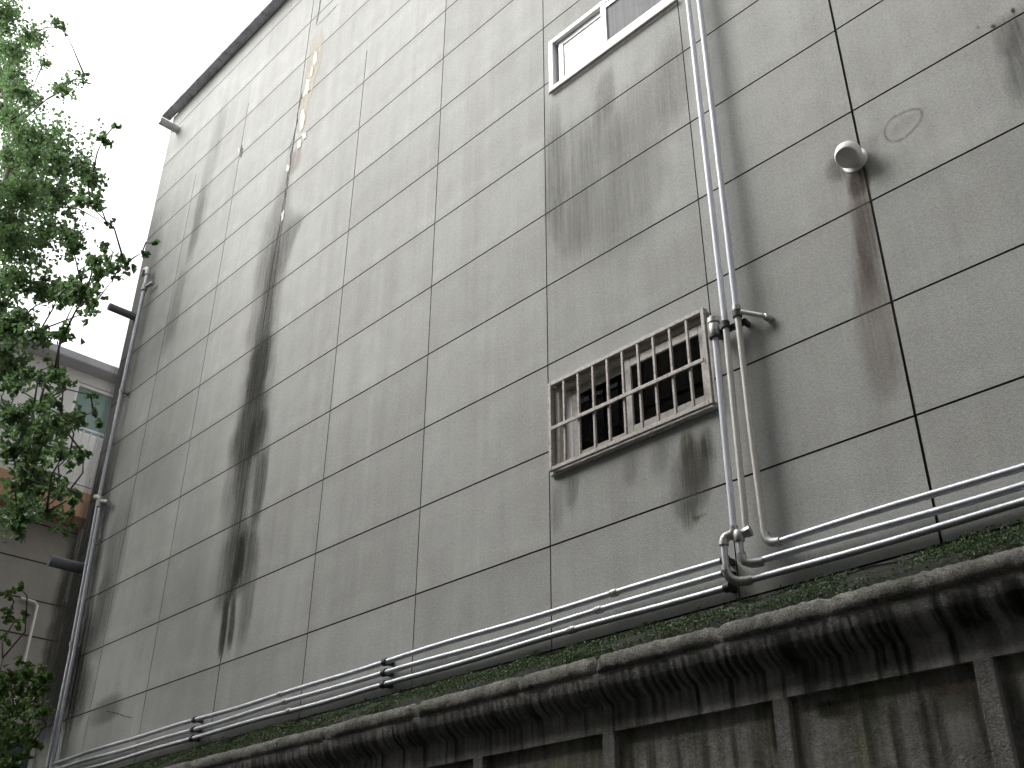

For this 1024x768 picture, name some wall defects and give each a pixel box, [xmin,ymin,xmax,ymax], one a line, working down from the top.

peeling [297,51,318,150]
damp [219,534,252,653]
damp [930,588,992,665]
damp [232,608,912,768]